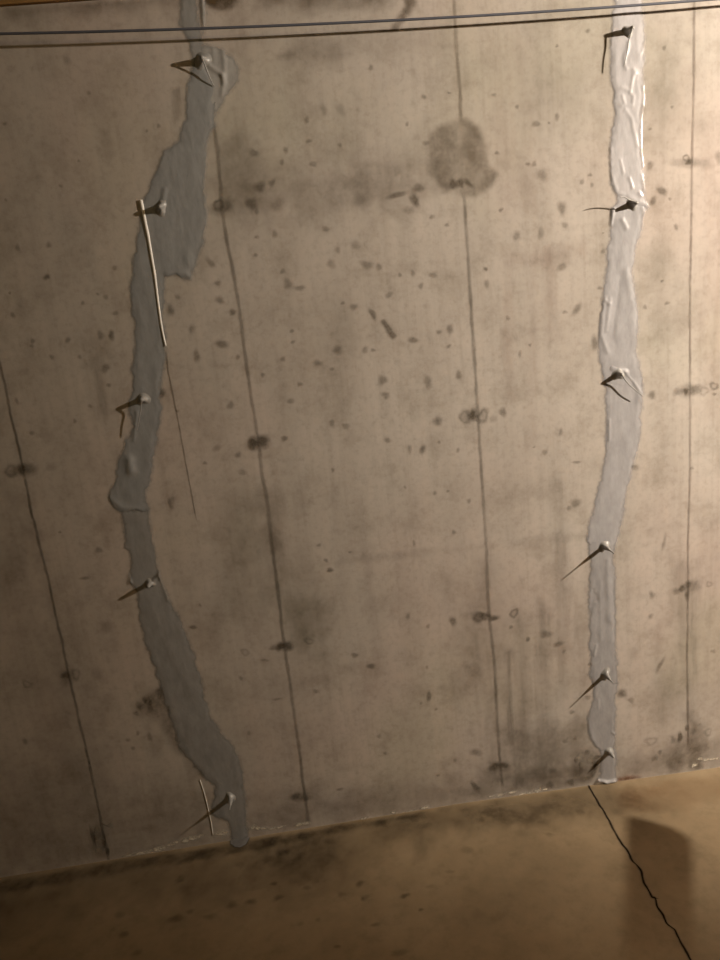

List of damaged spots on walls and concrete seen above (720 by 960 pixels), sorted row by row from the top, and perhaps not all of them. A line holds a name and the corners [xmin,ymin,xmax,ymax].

crack [109,0,249,848]
crack [587,0,691,960]